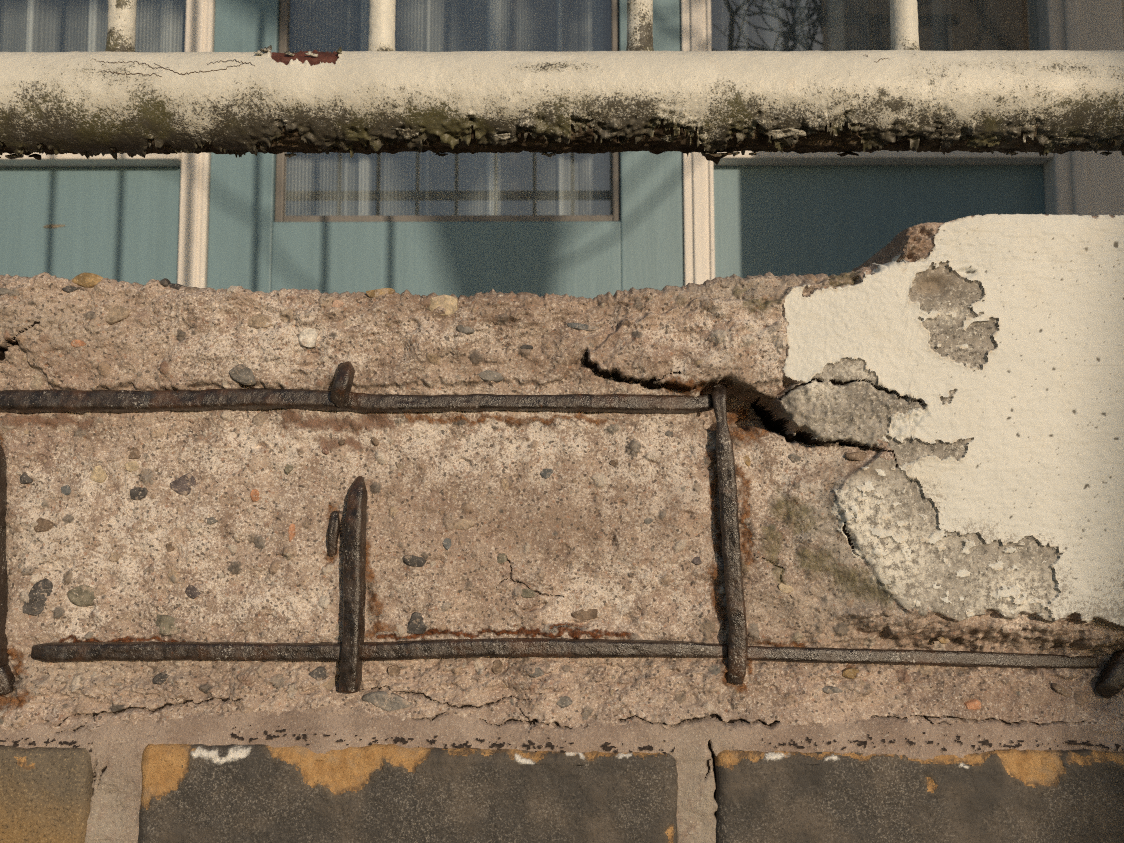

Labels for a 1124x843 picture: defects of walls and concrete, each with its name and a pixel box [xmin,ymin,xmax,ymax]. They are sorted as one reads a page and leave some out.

crack [0,321,40,361]
crack [584,350,695,392]
rust [667,377,705,395]
rust [282,409,607,449]
spalling [0,215,1124,734]
rust [736,467,753,565]
rust [706,450,726,627]
rust [365,542,631,640]
rust [60,634,186,642]
crack [48,697,242,733]
crack [362,685,572,729]
crack [872,715,1084,725]